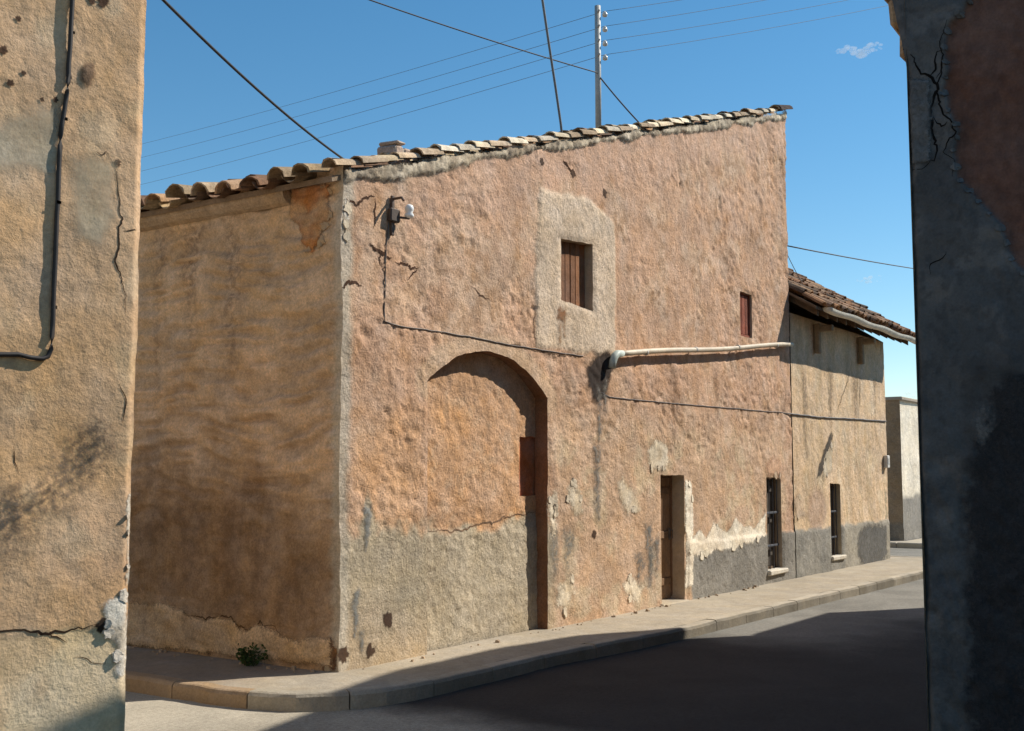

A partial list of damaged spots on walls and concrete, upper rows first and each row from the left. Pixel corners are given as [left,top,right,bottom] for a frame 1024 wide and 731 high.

crack [903,20,957,173]
crack [97,151,135,312]
spalling [290,183,352,253]
flaking render [647,440,668,473]
crack [432,511,536,533]
flaking render [685,480,766,588]
damp [858,524,887,564]
crack [0,624,107,664]
flaking render [102,557,337,676]
damp [352,590,364,652]